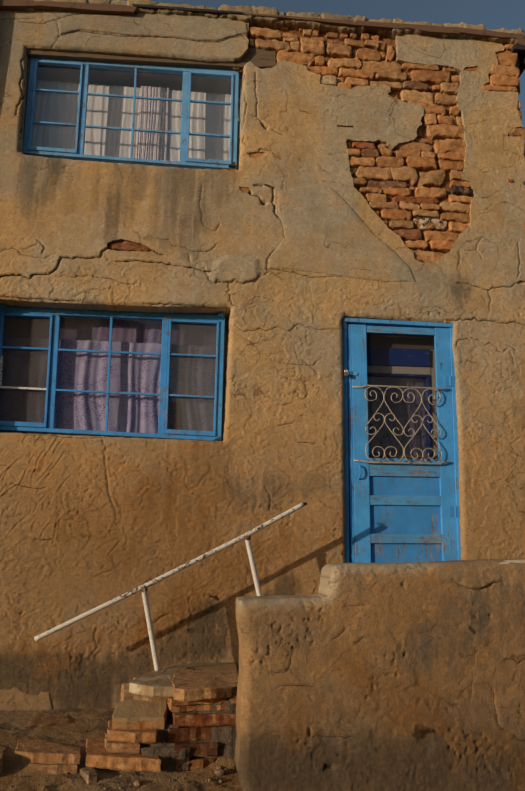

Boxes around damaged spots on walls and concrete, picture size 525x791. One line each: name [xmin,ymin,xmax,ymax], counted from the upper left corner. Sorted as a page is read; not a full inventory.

spalling [481,42,520,92]
spalling [247,25,478,263]
crack [0,244,135,285]
spalling [108,240,151,252]
crack [124,238,340,306]
crack [447,248,523,362]
water stain [0,603,226,709]